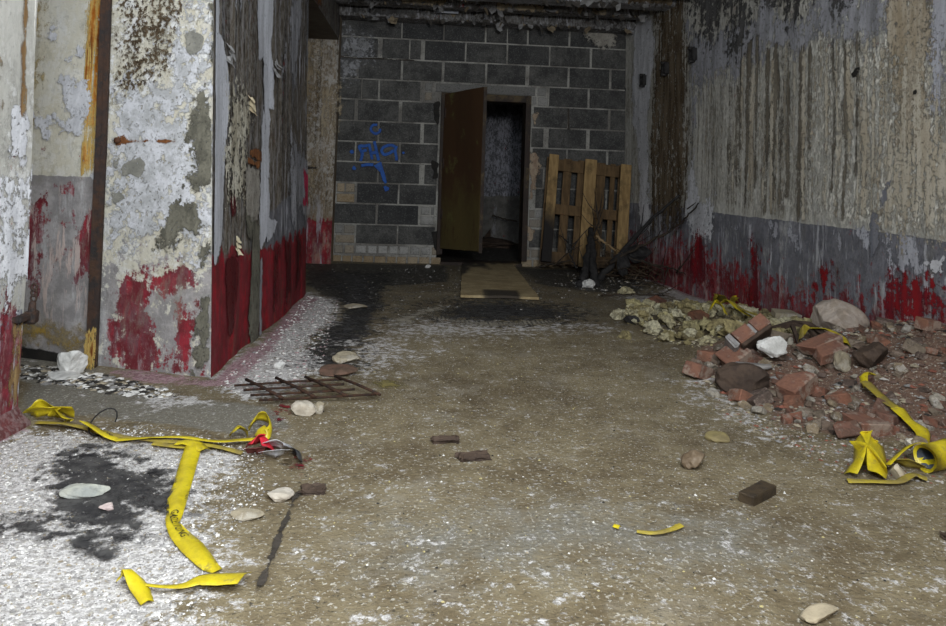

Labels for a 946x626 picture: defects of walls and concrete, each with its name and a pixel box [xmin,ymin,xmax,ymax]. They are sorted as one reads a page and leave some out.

corrosion [20,0,46,121]
peeling [0,44,93,324]
corrosion [80,0,100,176]
corrosion [115,135,175,146]
damp [111,0,186,96]
peeling [104,0,236,278]
damp [225,256,239,336]
peeling [236,0,309,343]
peeling [342,0,666,233]
damp [686,229,713,289]
damp [628,0,886,237]
peeling [854,224,945,280]